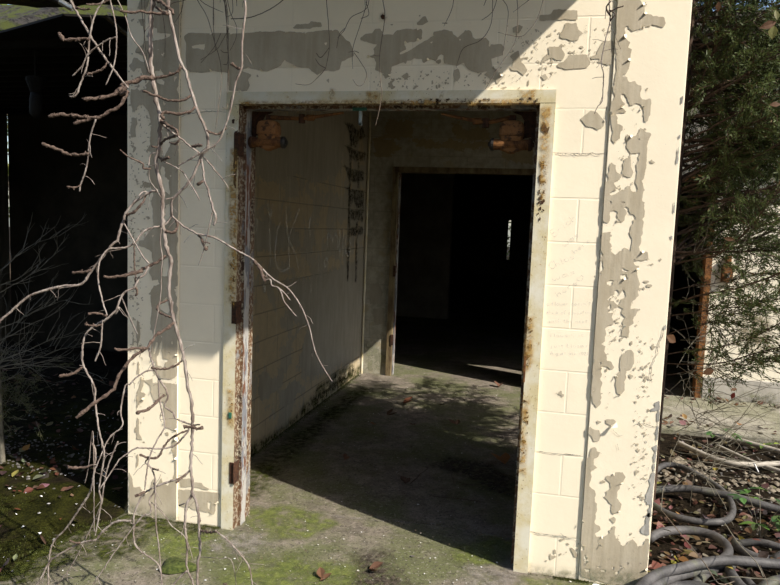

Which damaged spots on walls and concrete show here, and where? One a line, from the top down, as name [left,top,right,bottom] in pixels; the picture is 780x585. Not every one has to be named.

rust [335,90,551,222]
rust [229,150,238,305]
peeling [360,0,666,585]
rust [525,317,533,369]
rust [519,400,529,473]